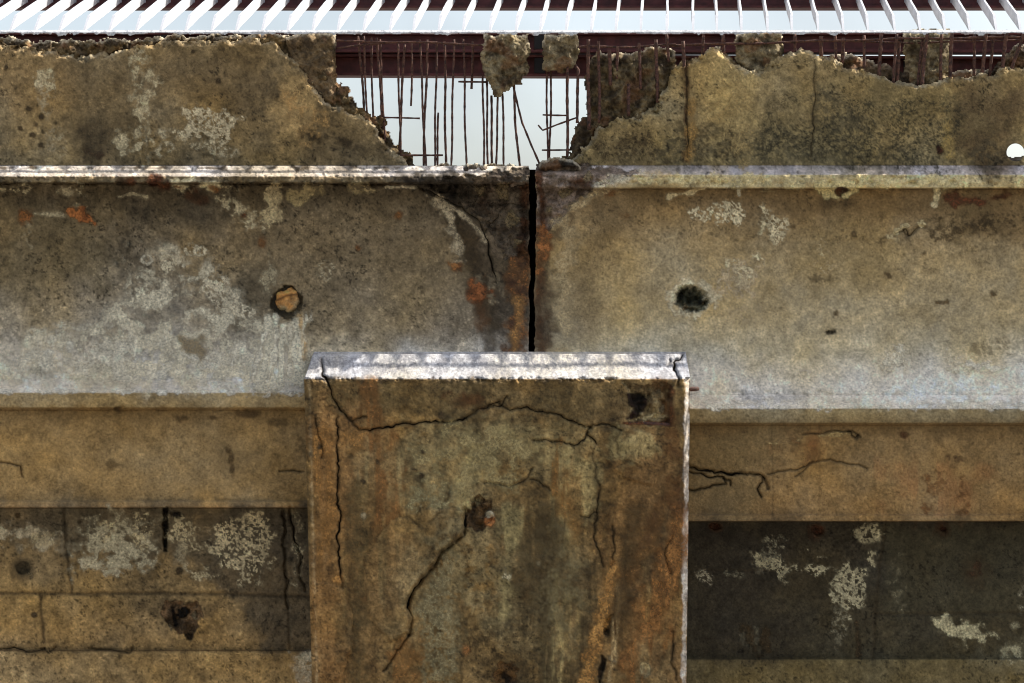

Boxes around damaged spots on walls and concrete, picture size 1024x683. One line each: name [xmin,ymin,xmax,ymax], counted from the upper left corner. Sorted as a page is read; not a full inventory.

spalling [0,33,302,59]
leakage [113,48,244,156]
spalling [316,71,415,166]
crack [420,188,516,277]
corrosion [448,170,553,352]
spalling [674,285,709,313]
crack [317,364,616,586]
crack [690,460,844,494]
leakage [78,511,276,586]
spalling [161,600,203,640]
leakage [754,524,881,658]
leakage [933,613,995,643]